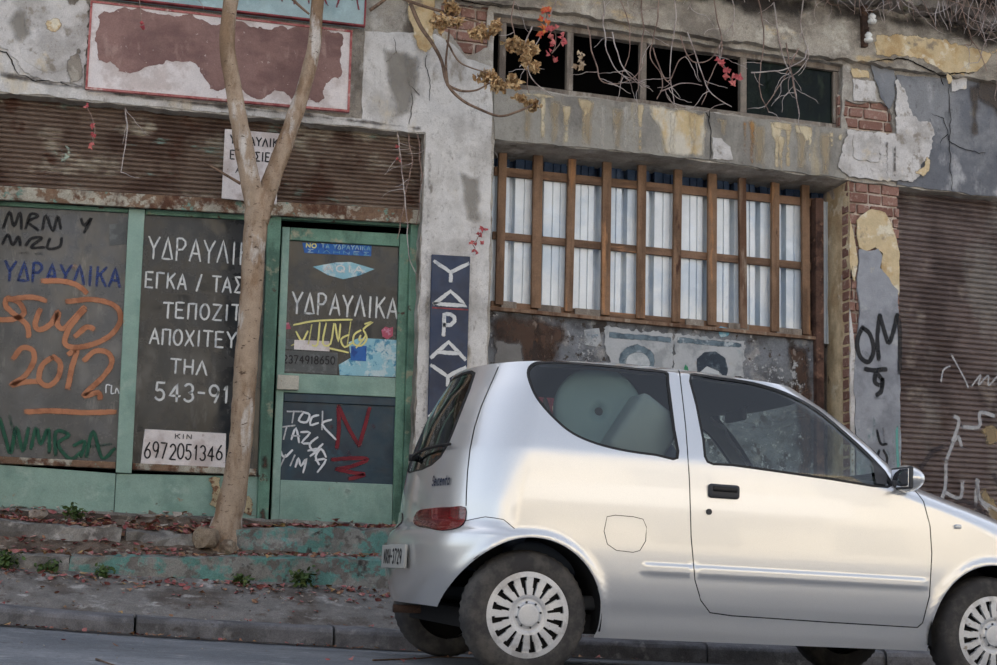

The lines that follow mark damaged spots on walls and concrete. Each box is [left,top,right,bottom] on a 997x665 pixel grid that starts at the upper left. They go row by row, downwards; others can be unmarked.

crack [0,50,67,85]
flaking render [0,0,90,86]
flaking render [408,0,488,56]
damp [527,94,705,156]
damp [756,122,842,170]
flaking render [836,34,997,182]
crack [870,57,997,190]
flaking render [849,209,901,476]